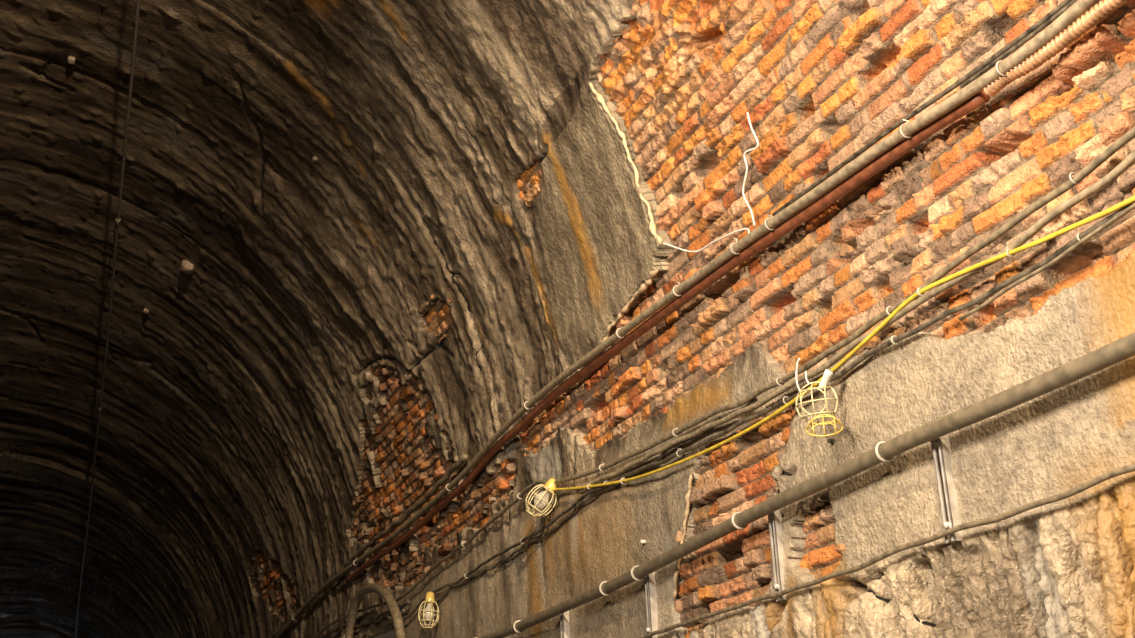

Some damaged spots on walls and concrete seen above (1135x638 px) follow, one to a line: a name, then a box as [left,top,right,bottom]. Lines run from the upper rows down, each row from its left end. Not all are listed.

corrosion [544,135,600,292]
spalling [350,0,1135,589]
spalling [251,551,298,620]
spalling [673,400,795,638]